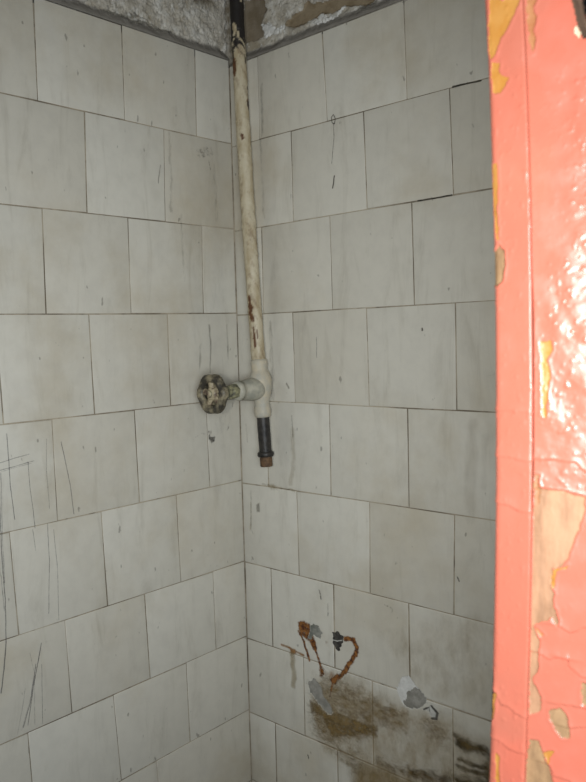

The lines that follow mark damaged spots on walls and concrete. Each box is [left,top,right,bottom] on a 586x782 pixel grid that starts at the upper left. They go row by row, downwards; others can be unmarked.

flaking render [244,0,375,43]
peeling [495,247,505,287]
peeling [528,475,585,739]
rust [281,621,359,691]
spalling [396,675,439,720]
water stain [454,735,490,782]
peeling [526,739,553,782]